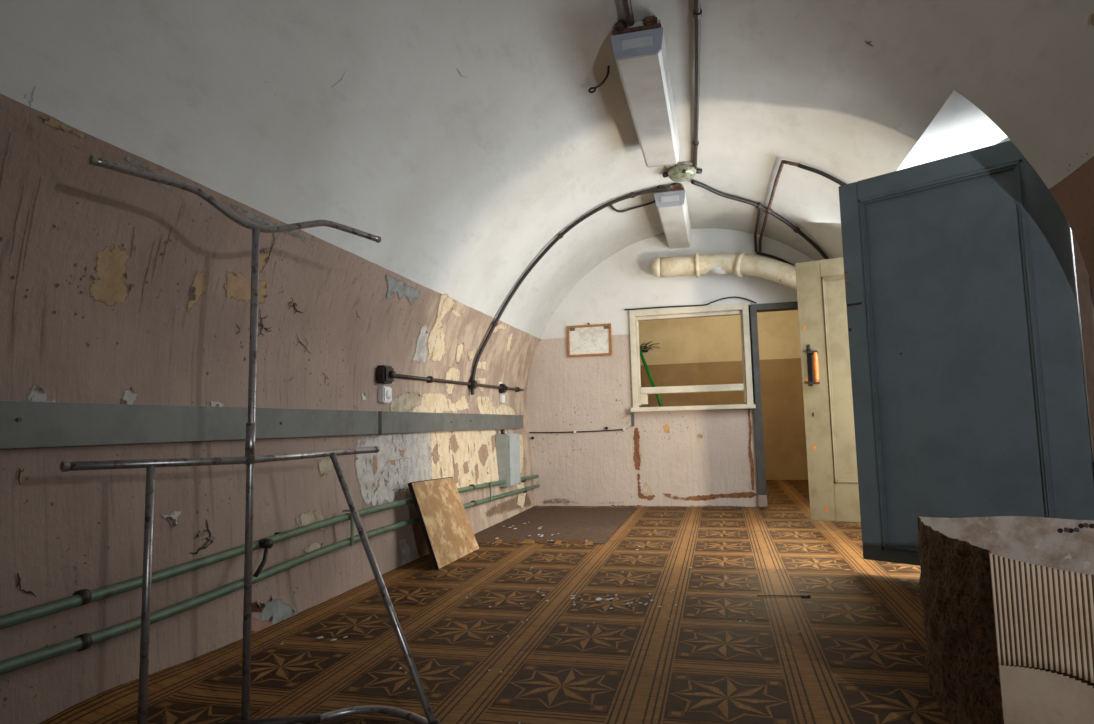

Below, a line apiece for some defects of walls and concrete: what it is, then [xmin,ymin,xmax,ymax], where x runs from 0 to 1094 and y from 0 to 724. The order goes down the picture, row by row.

peeling [390,293,516,415]
peeling [354,429,499,506]